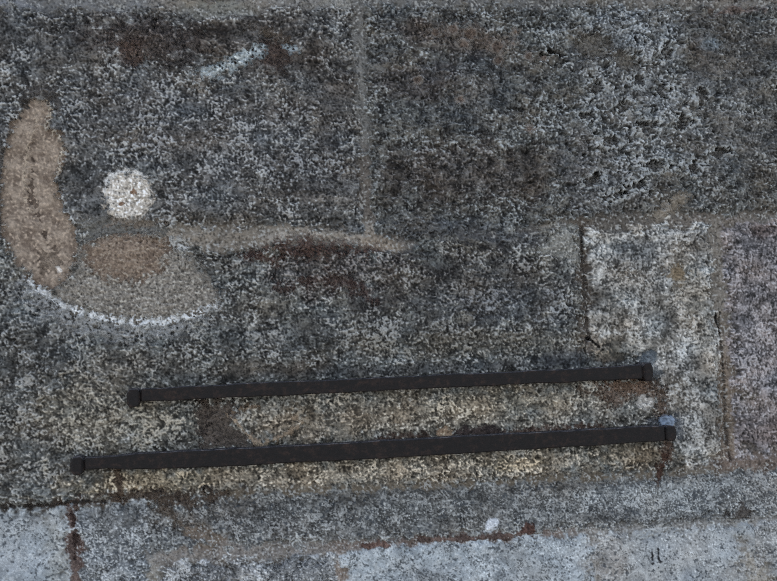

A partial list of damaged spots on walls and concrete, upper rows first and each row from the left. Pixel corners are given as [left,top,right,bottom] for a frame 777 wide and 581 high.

rust [417,522,535,542]
rust [66,504,82,581]
rust [361,539,390,550]